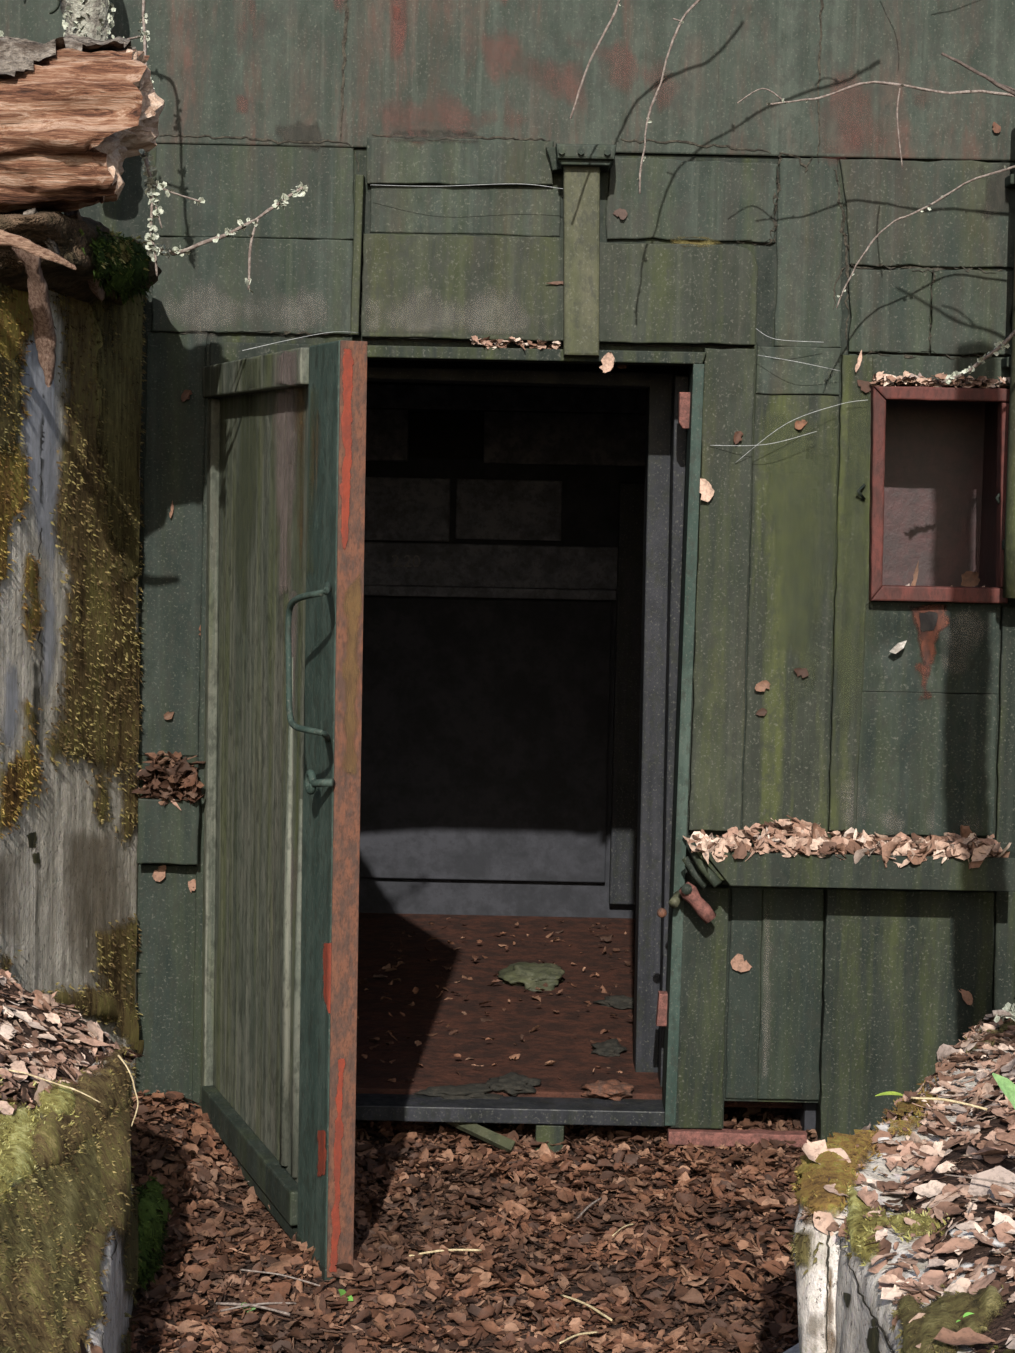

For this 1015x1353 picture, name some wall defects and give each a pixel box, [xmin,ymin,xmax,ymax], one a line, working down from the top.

leakage [5,334,59,746]
rust [343,578,362,773]
rust [912,602,949,698]
leakage [809,1269,851,1353]